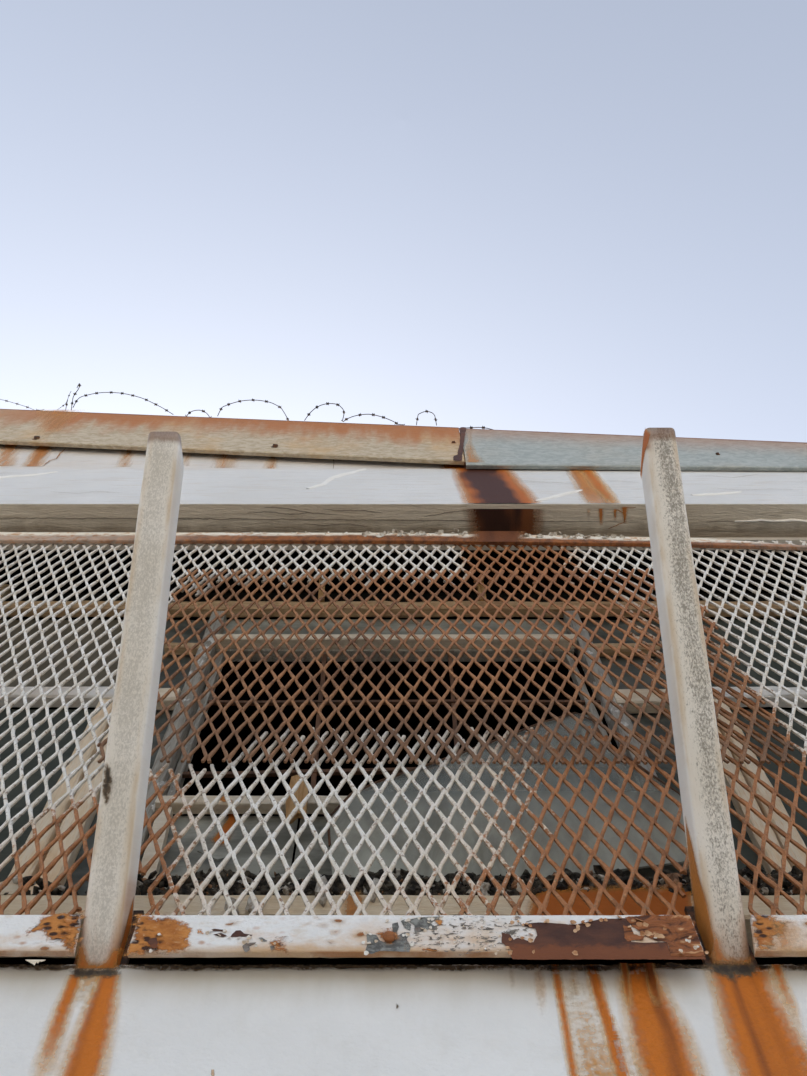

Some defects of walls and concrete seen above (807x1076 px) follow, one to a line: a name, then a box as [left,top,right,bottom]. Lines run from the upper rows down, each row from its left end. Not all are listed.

rust [0,444,16,466]
rust [27,446,50,466]
rust [443,427,540,542]
rust [570,470,627,522]
peeling [361,916,443,955]
rust [501,824,807,1076]
peeling [623,915,709,969]
rust [28,902,203,1076]